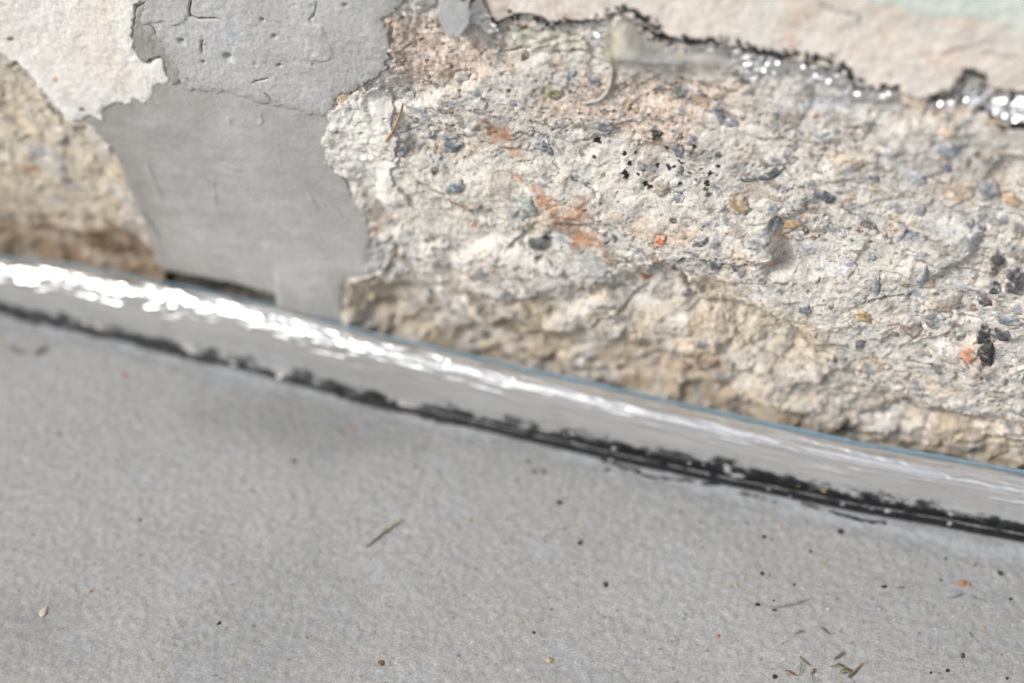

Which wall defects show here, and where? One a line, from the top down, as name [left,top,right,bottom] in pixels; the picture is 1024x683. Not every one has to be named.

spalling [0,0,277,305]
spalling [321,0,1024,470]